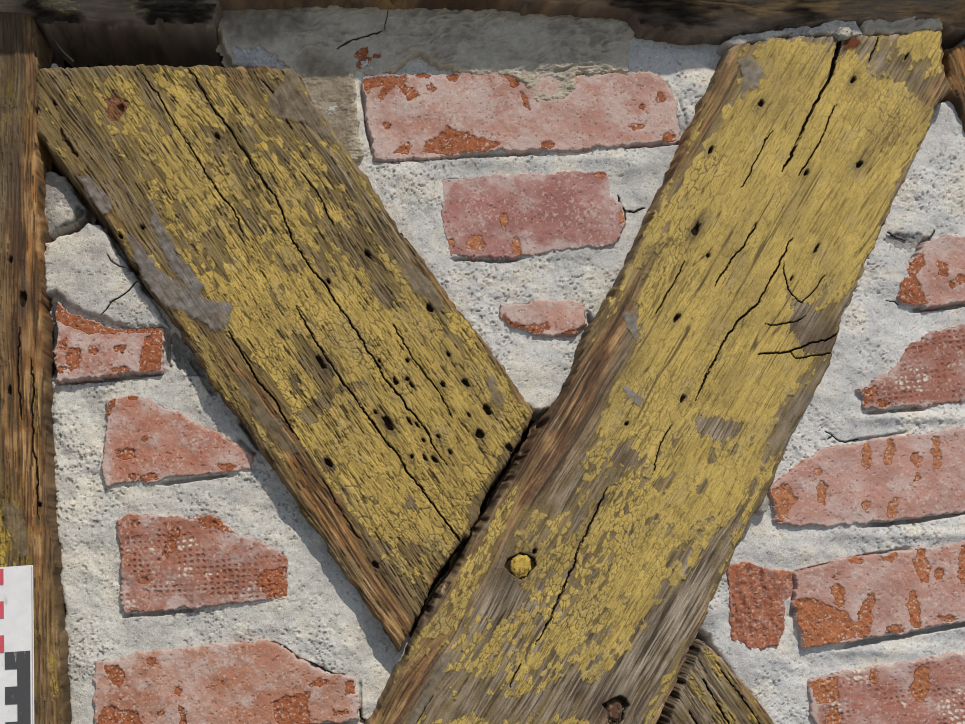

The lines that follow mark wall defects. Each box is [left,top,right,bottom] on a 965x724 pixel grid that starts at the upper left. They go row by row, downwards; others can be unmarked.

crack [137,68,244,236]
spalling [354,46,437,101]
spalling [393,126,500,155]
crack [781,41,841,176]
spalling [56,303,206,381]
crack [187,68,452,465]
crack [695,237,823,401]
spalling [883,233,965,305]
crack [17,328,40,520]
crack [296,306,473,549]
peeling [417,613,684,724]
spalling [794,573,876,649]